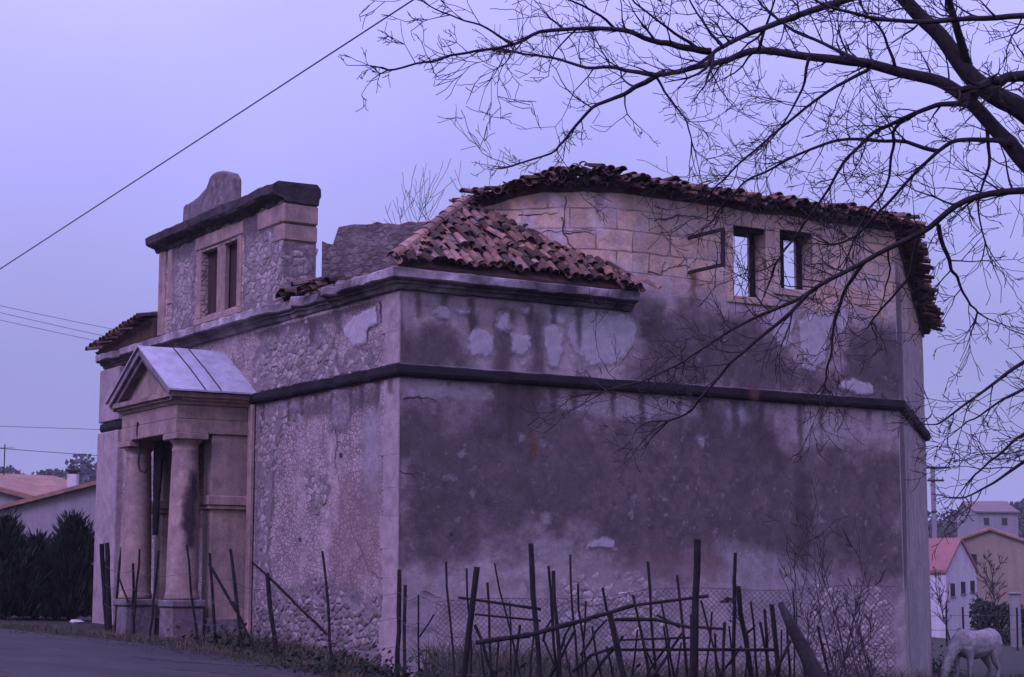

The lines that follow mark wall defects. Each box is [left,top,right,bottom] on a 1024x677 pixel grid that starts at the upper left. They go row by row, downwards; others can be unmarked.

flaking render [344,306,377,346]
leakage [400,326,465,367]
flaking render [432,306,470,319]
flaking render [467,307,531,358]
leakage [497,310,512,370]
flaking render [544,310,637,368]
leakage [632,267,904,400]
flaking render [839,378,874,395]
leakage [181,472,197,546]
leakage [399,385,907,587]